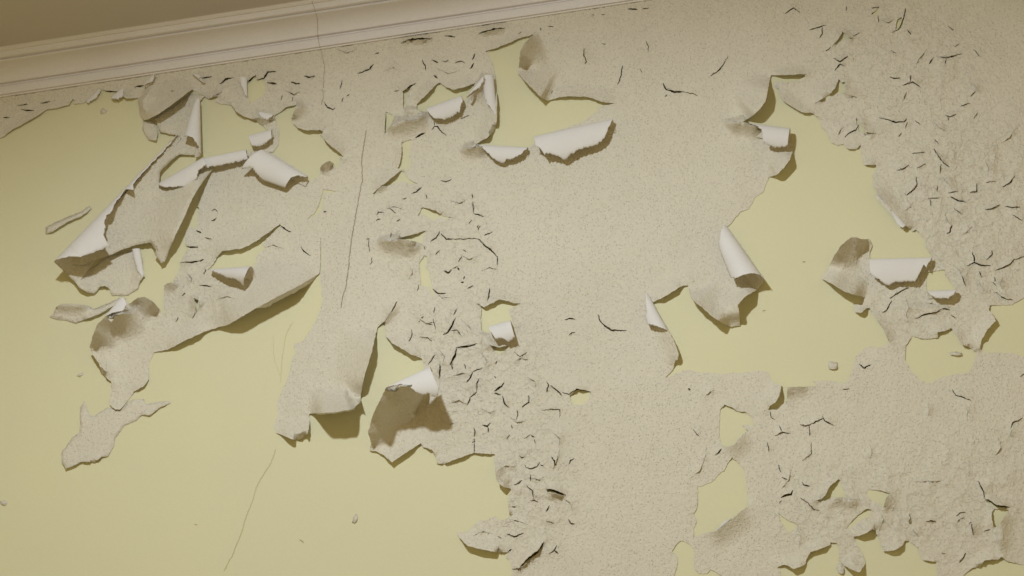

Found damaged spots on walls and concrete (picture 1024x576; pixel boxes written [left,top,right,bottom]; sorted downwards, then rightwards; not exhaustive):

peeling [0,34,542,576]
crack [341,130,450,307]
crack [409,195,589,570]
peeling [374,0,1024,576]
crack [785,7,1021,233]
crack [962,251,1024,300]